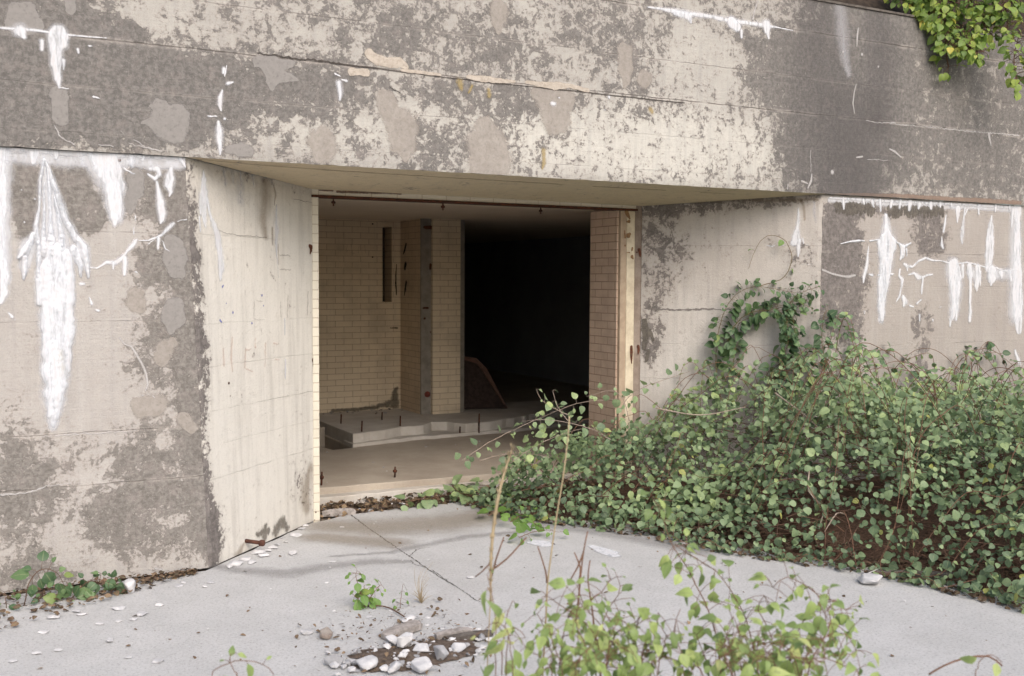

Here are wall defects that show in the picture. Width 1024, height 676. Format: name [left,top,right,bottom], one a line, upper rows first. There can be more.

leakage [648,6,793,39]
leakage [0,25,101,89]
crack [258,52,685,103]
leakage [208,65,233,155]
leakage [866,120,1020,145]
leakage [0,147,186,304]
leakage [828,193,1023,334]
leakage [641,319,654,363]
crack [351,515,480,602]